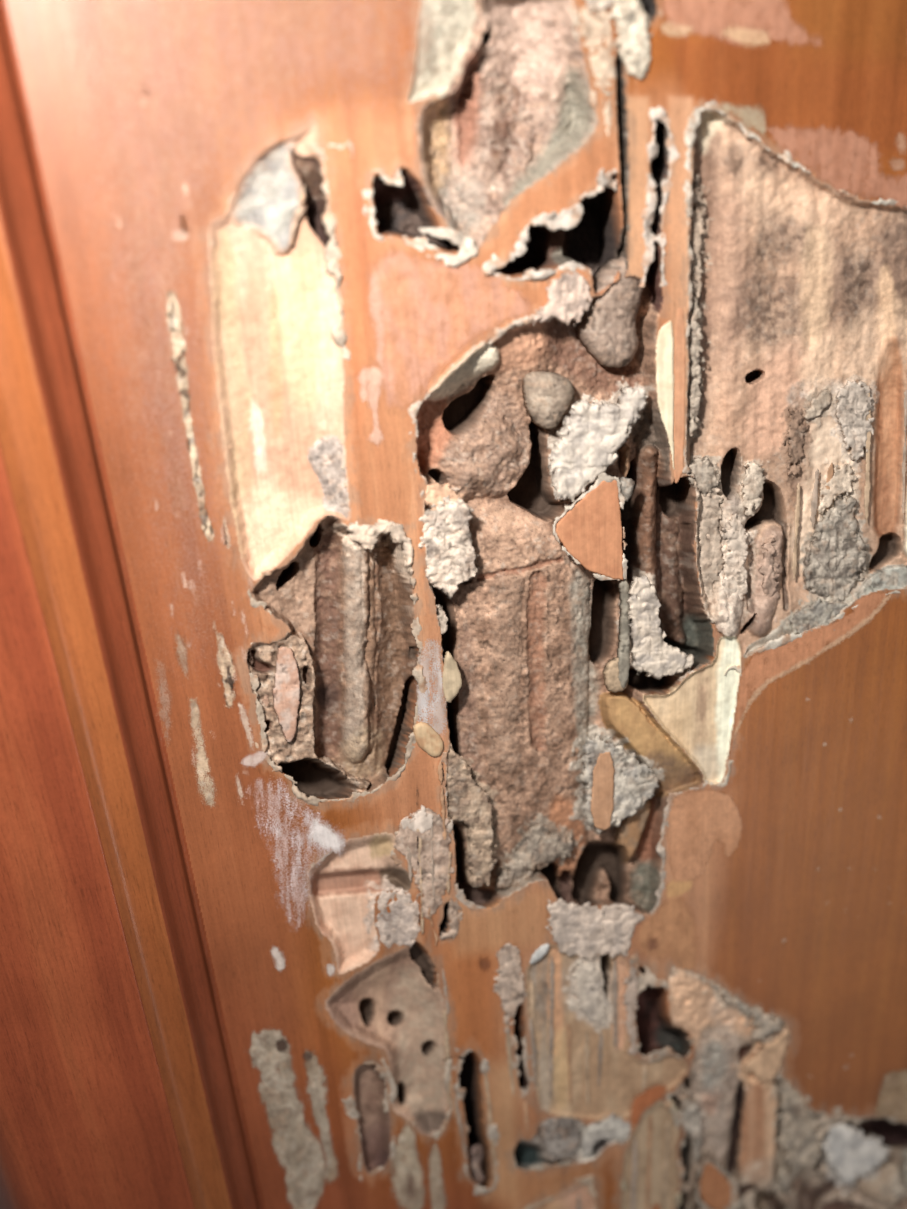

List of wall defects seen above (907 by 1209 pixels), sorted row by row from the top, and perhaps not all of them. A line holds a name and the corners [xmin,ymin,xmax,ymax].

spalling [217,0,907,1141]
spalling [623,954,907,1209]
spalling [342,1095,396,1182]
spalling [463,1124,500,1196]
spalling [514,1113,634,1209]